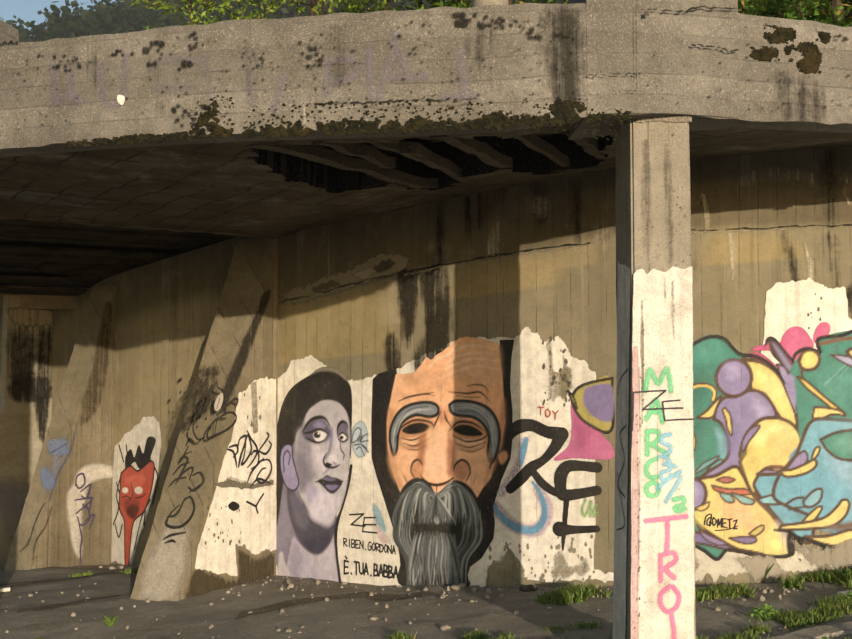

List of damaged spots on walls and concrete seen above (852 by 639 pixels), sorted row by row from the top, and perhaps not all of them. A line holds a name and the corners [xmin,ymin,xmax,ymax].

crack [641,5,748,13]
damp [547,7,579,115]
crack [589,29,640,92]
crack [691,44,738,52]
spalling [247,133,615,194]
crack [692,224,852,233]
spalling [282,252,411,304]
damp [397,215,450,372]
crack [279,242,591,304]
damp [7,308,53,444]
damp [386,334,399,371]